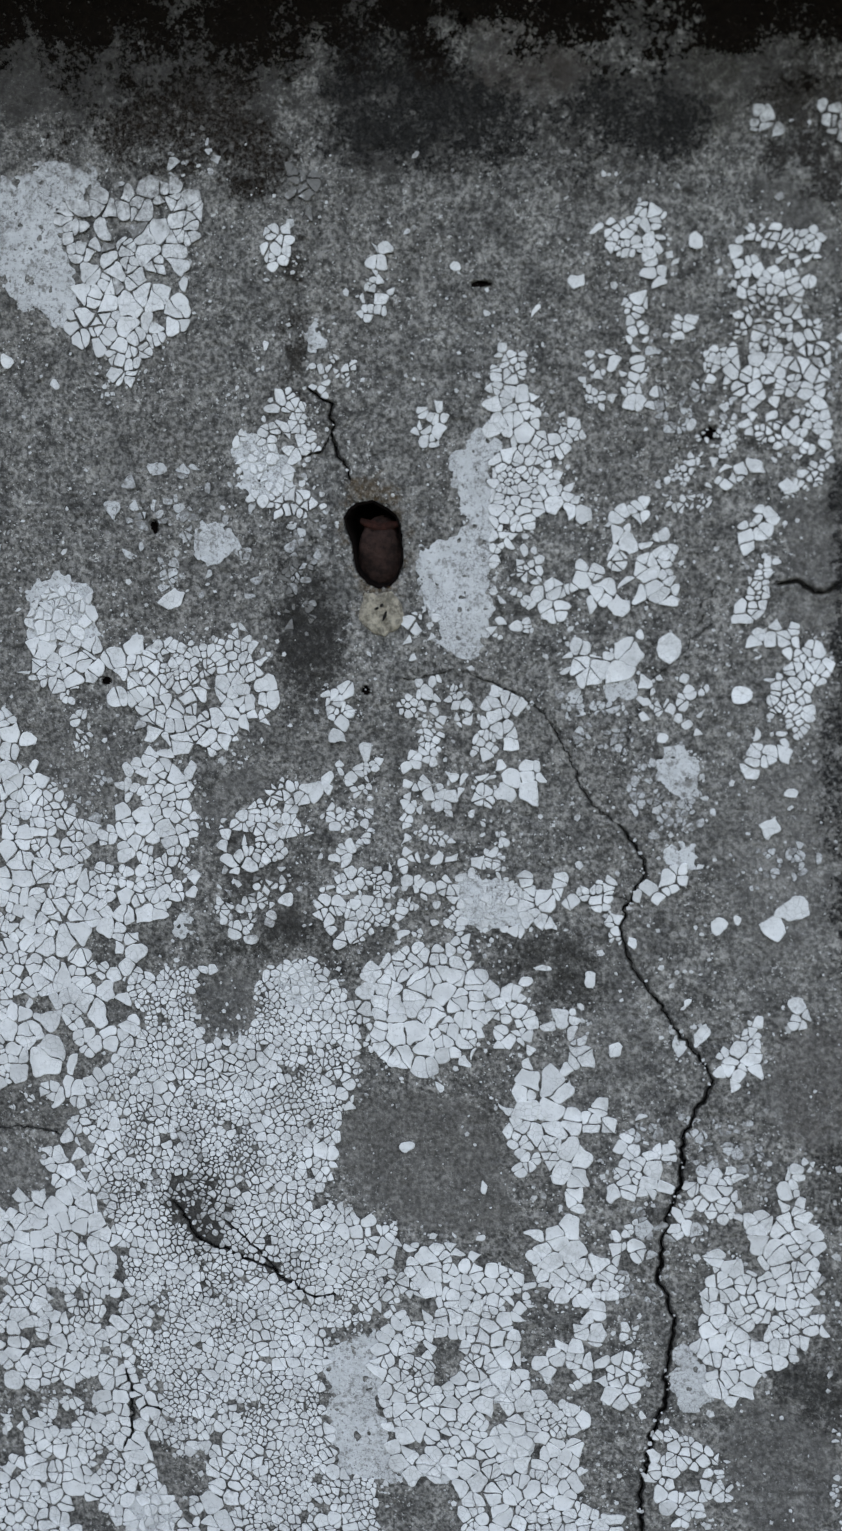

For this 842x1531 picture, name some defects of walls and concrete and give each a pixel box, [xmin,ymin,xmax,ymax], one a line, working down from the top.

water stain [0,0,842,207]
peeling [1,353,14,369]
peeling [53,152,203,388]
peeling [103,354,358,630]
peeling [410,400,449,448]
spalling [450,261,492,288]
peeling [481,201,842,656]
peeling [731,504,835,780]
crack [778,579,842,593]
peeling [0,585,830,1531]
crack [397,668,714,1531]
crack [173,1201,332,1297]